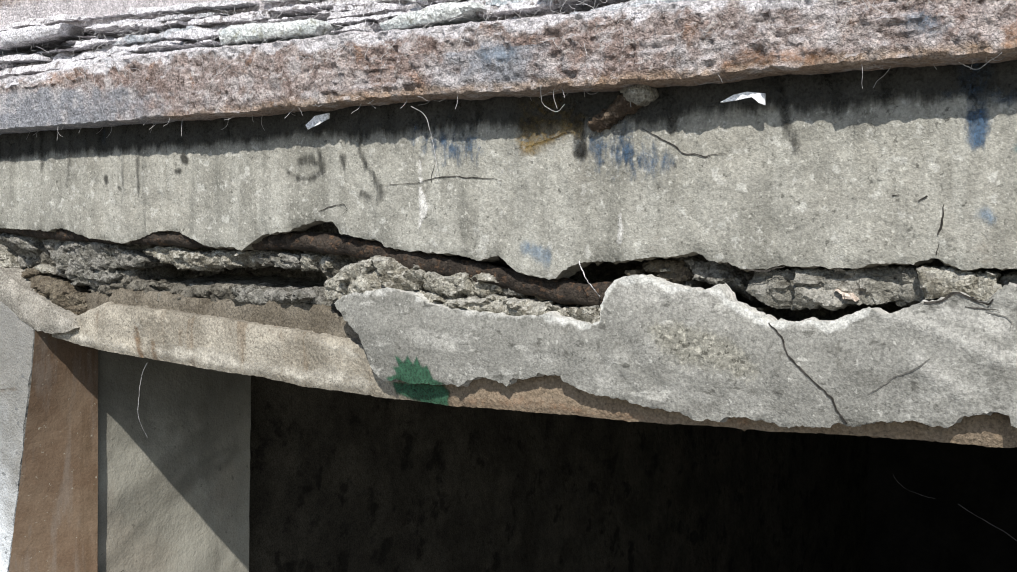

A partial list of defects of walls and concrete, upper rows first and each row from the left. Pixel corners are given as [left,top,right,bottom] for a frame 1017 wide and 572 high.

damp [0,91,623,167]
peeling [306,113,330,129]
rust [0,0,1017,153]
peeling [721,92,766,105]
damp [615,60,1017,149]
spalling [0,228,613,346]
spalling [624,256,1017,312]
peeling [157,347,367,390]
crack [768,323,848,424]